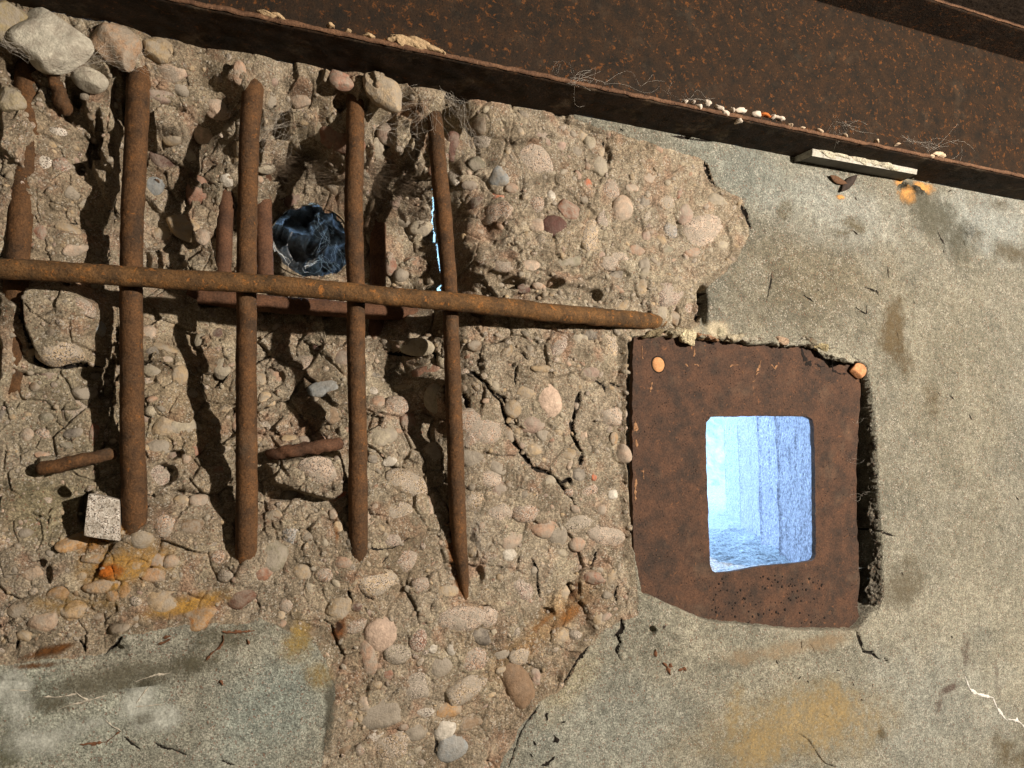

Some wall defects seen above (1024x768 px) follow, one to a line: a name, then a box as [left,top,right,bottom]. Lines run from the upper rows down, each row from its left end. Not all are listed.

spalling [770,335,862,363]
spalling [0,0,765,768]
crack [462,352,619,505]
rust [86,549,165,590]
rust [447,534,461,594]
crack [532,560,540,597]
crack [965,676,1024,727]